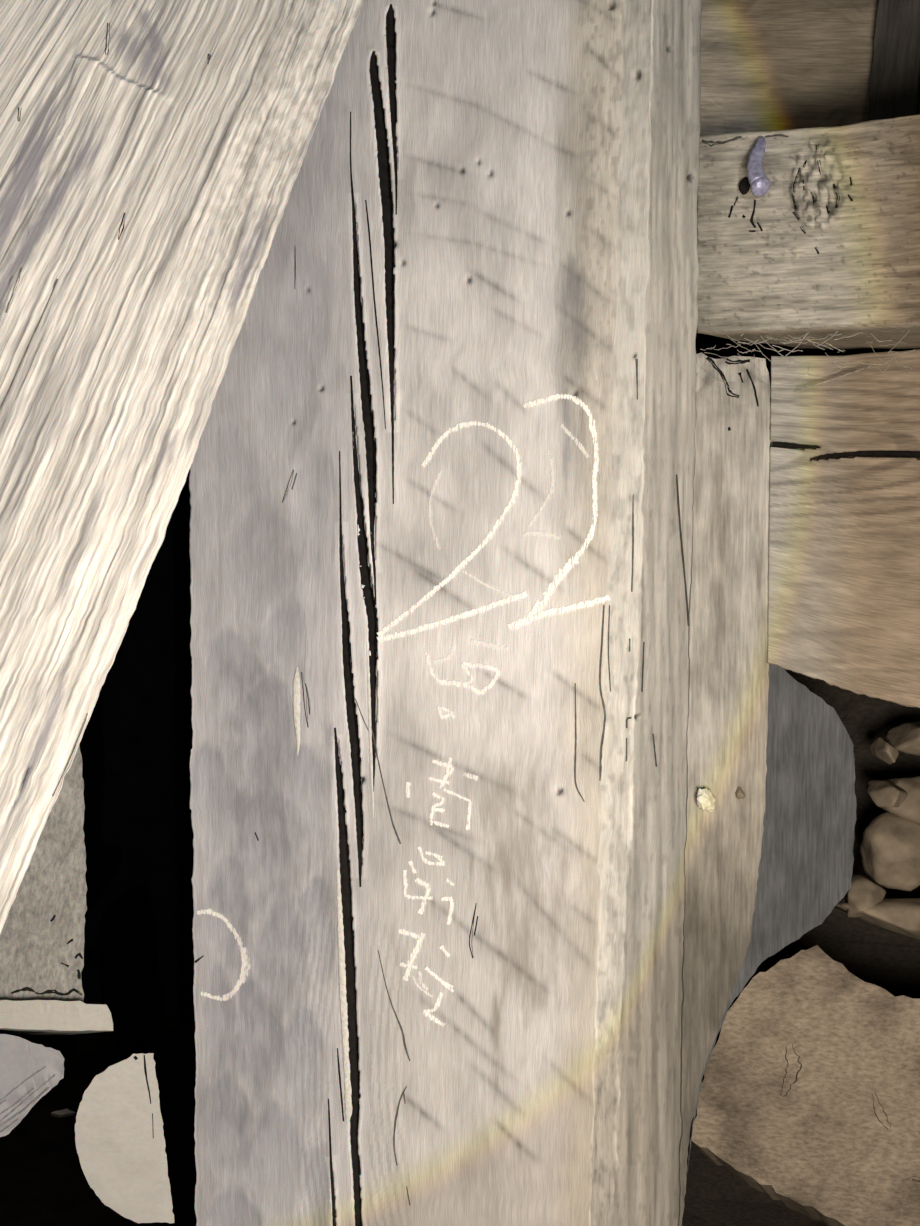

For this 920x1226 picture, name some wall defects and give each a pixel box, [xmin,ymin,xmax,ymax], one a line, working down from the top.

crack [328,4,410,1226]
crack [772,442,920,460]